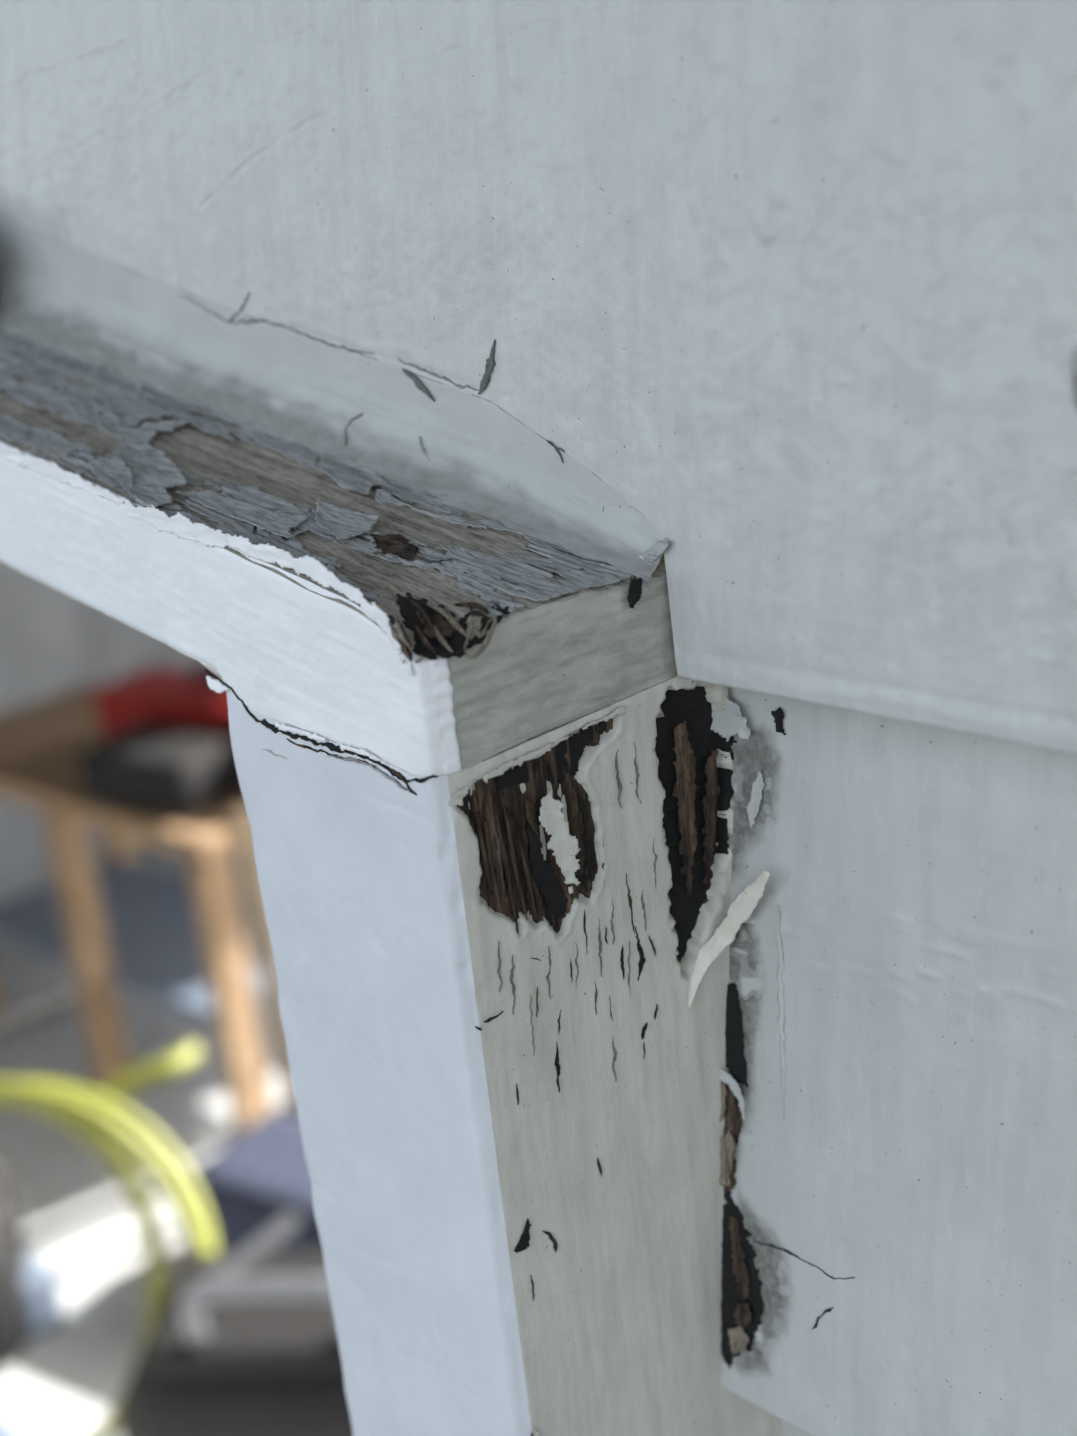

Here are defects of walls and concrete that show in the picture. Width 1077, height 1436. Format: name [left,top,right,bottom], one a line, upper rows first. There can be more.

crack [178,292,479,391]
crack [546,440,565,464]
peeling [0,330,643,676]
crack [205,669,439,796]
peeling [449,706,626,807]
peeling [539,790,581,894]
peeling [746,771,765,828]
peeling [771,707,786,735]
peeling [605,873,656,981]
peeling [687,870,770,1008]
peeling [720,1068,745,1121]
peeling [514,1219,558,1253]